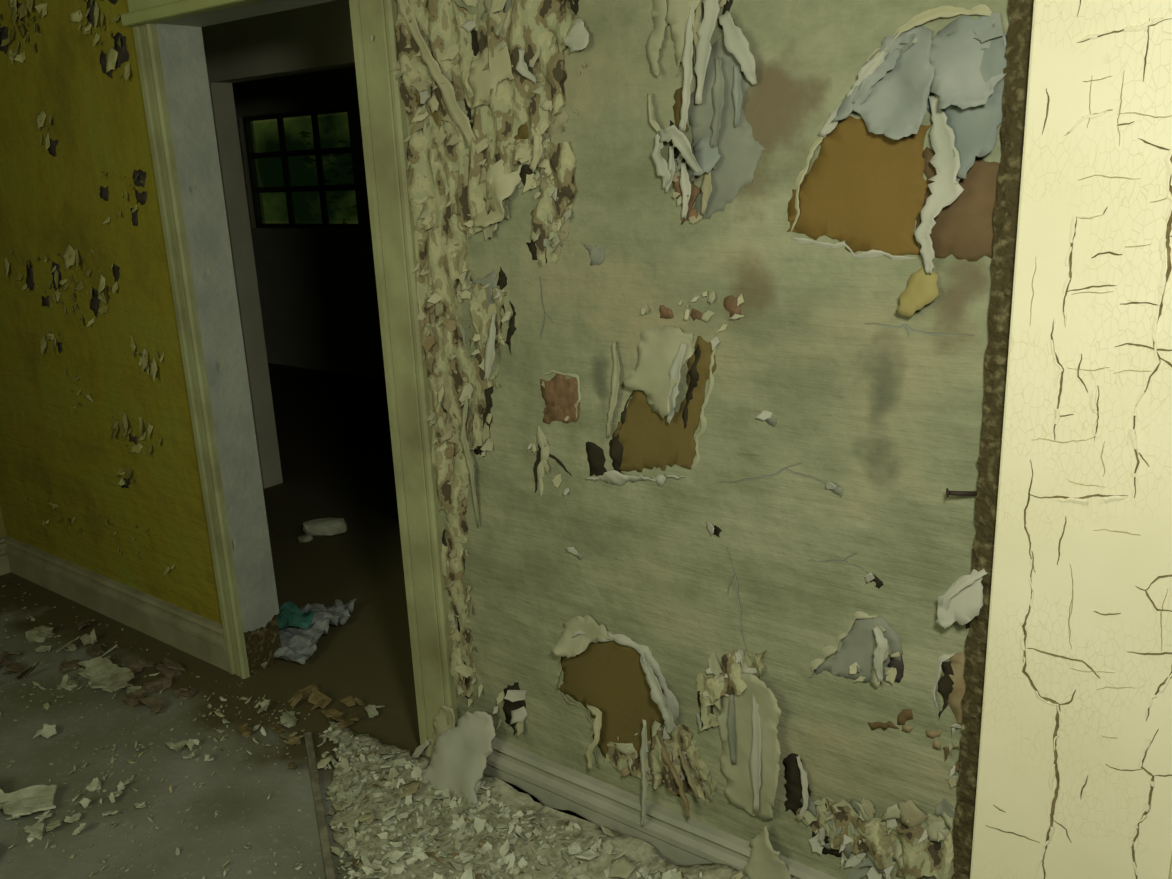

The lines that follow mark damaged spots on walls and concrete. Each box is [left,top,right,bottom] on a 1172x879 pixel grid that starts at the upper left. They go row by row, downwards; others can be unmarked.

peeling [69,0,130,81]
peeling [98,169,147,226]
peeling [787,116,1000,262]
peeling [4,243,120,327]
peeling [390,0,590,707]
peeling [612,290,744,472]
crack [986,0,1172,879]
peeling [492,682,528,736]
peeling [559,641,665,772]
spalling [808,611,904,688]
peeling [795,652,966,879]
peeling [935,569,988,629]